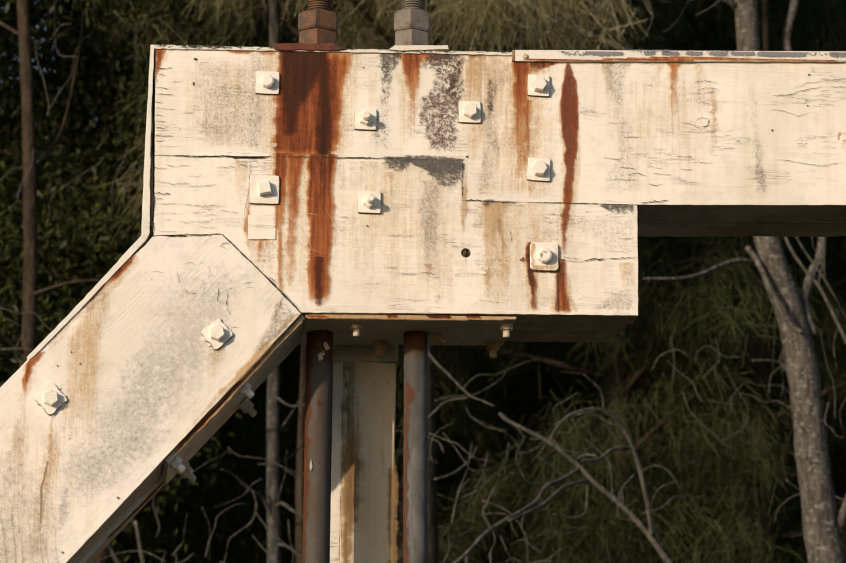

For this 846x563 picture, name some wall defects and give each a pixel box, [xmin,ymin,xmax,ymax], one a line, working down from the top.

corrosion [228,50,351,304]
water stain [374,53,401,146]
corrosion [394,53,452,104]
water stain [384,54,467,274]
water stain [479,60,504,178]
water stain [483,192,506,258]
corrosion [512,56,837,312]
corrosion [22,352,42,391]
corrosion [302,330,333,563]
corrosion [176,313,514,451]
corrosion [388,381,414,563]